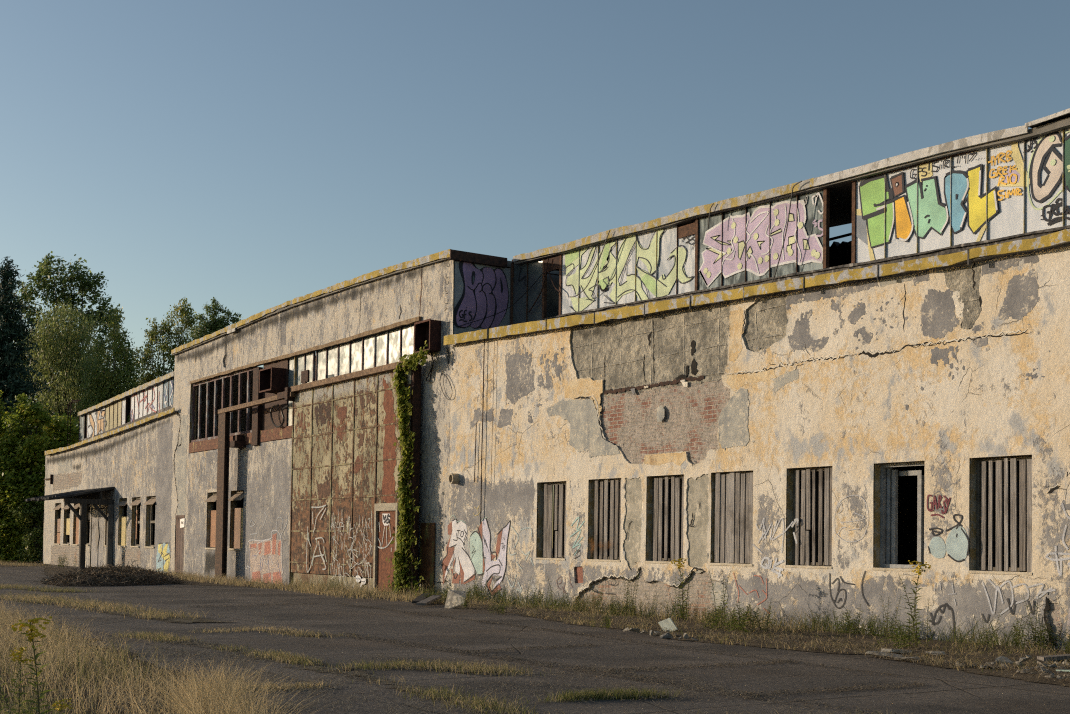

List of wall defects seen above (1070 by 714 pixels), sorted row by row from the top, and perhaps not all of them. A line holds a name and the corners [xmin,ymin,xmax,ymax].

crack [728,262,1031,375]
peeling [905,254,1039,379]
spalling [470,278,899,619]
crack [557,521,705,605]
peeling [917,585,935,612]